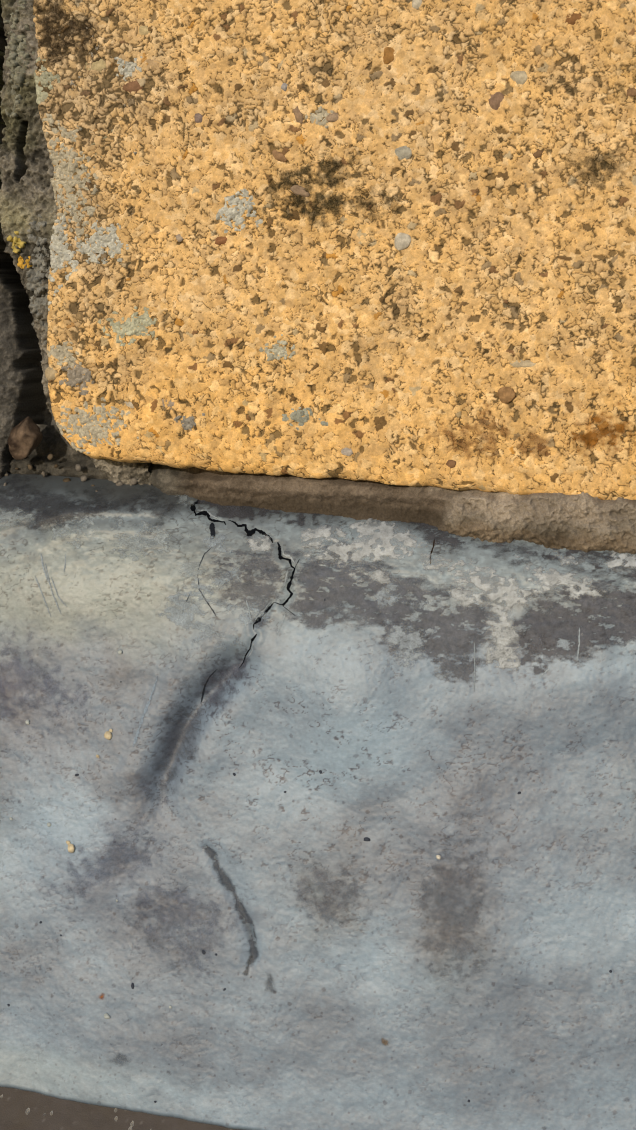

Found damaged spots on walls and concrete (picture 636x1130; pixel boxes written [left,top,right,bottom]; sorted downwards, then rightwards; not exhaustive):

crack [182,500,300,702]